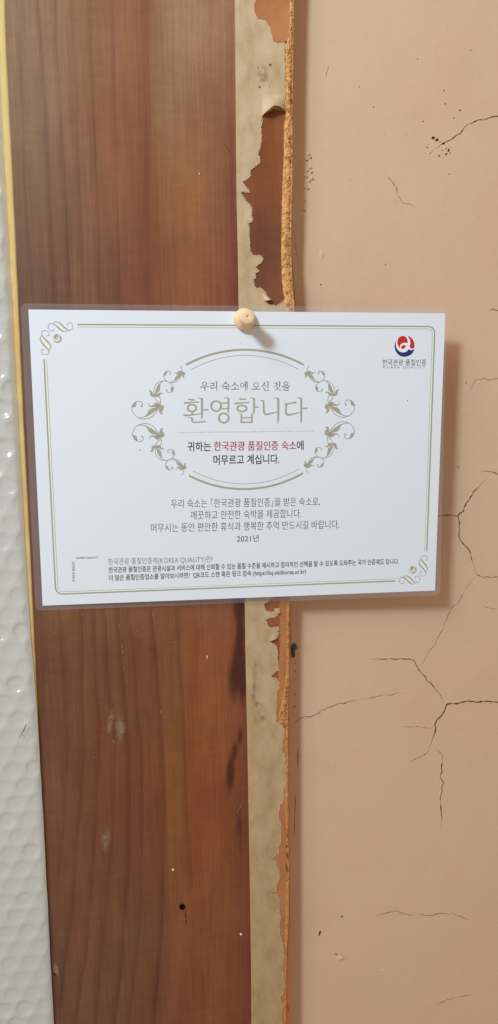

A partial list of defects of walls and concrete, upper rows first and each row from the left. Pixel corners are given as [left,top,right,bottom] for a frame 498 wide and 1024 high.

crack [428,114,498,152]
crack [438,471,498,579]
crack [291,694,393,727]
crack [367,596,498,826]